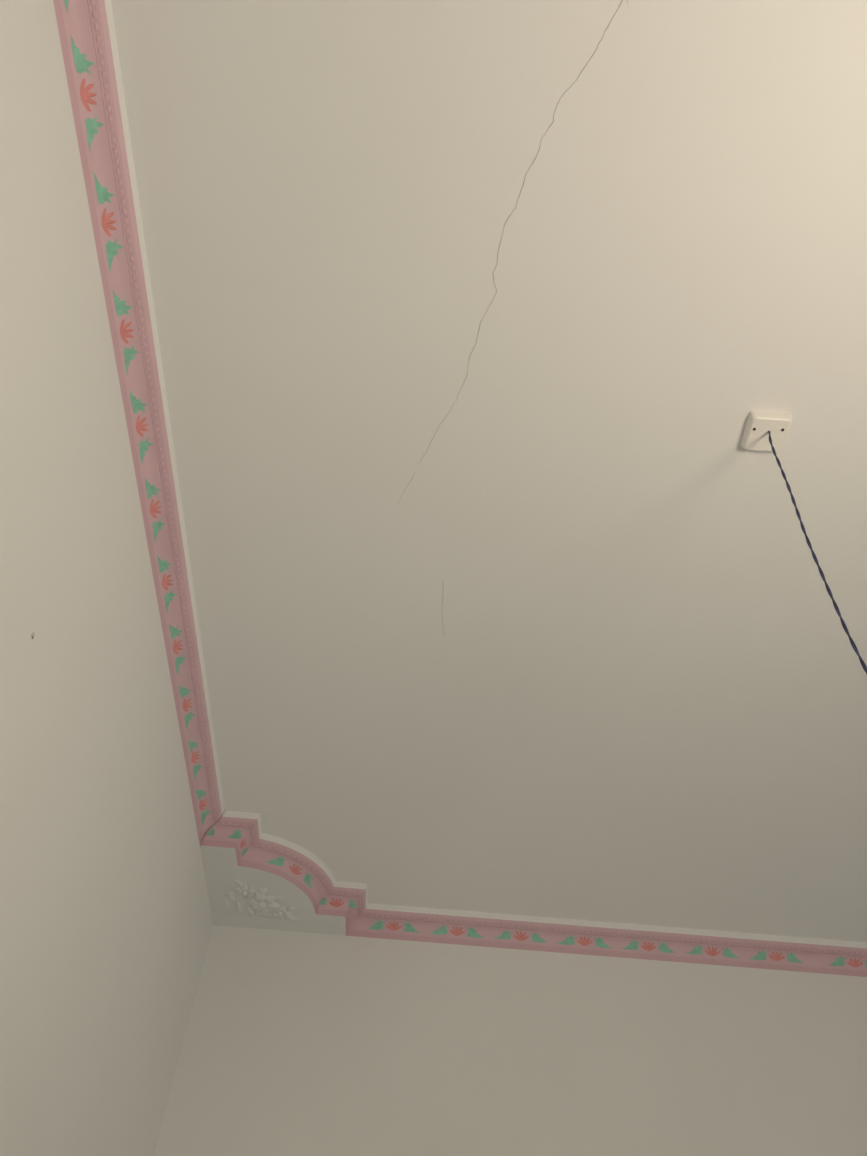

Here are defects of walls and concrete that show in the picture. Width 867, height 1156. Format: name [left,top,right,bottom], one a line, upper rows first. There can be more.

crack [397,0,628,505]